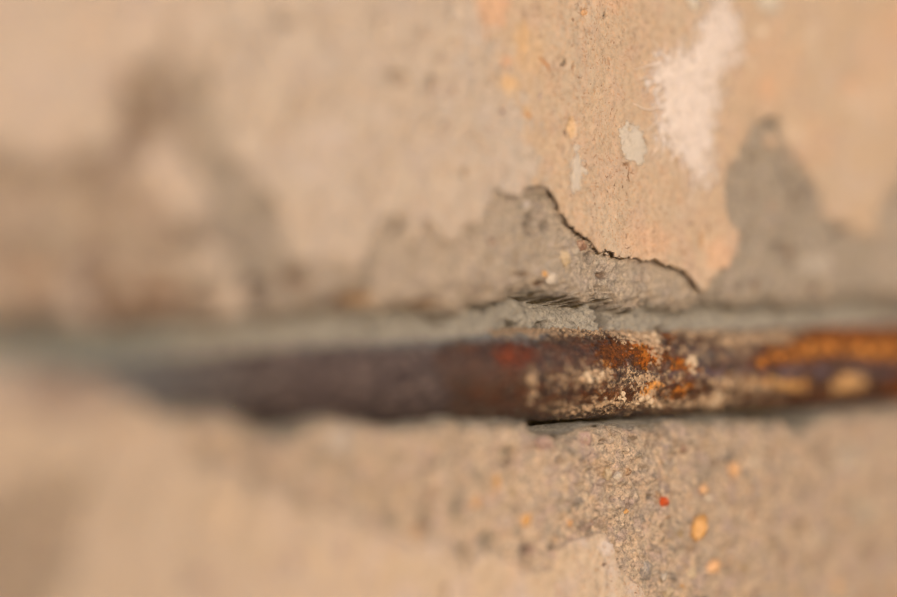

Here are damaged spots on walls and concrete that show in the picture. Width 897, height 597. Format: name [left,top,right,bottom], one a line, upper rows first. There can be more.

spalling [0,39,897,330]
damp [619,0,747,204]
rust [575,331,703,406]
rust [722,324,897,398]